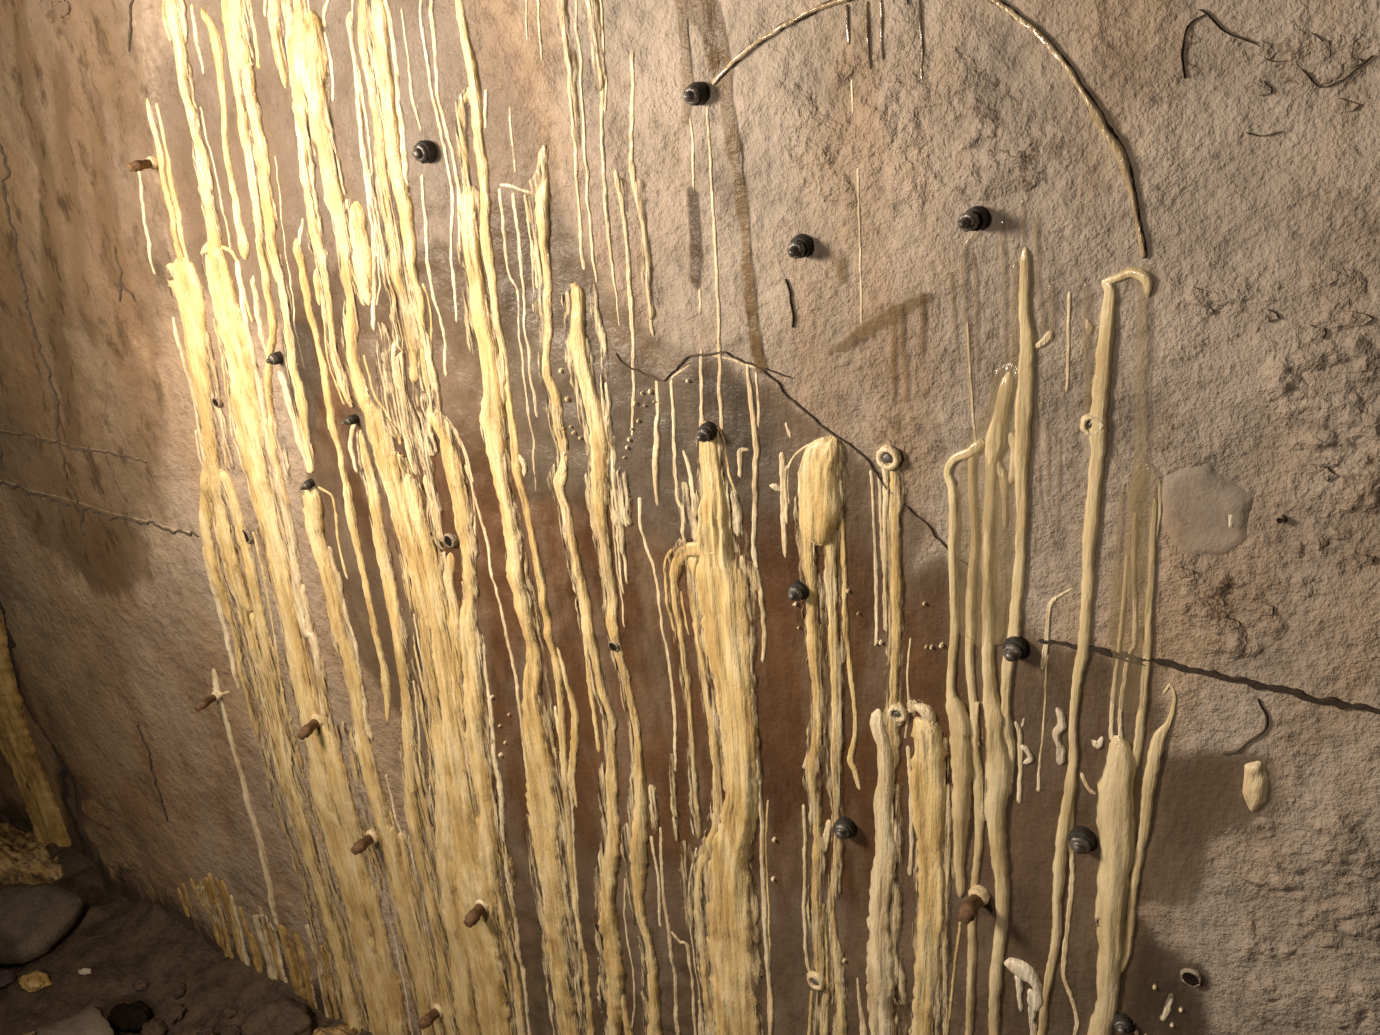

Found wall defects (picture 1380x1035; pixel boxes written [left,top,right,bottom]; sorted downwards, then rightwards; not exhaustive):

crack [126,0,134,52]
damp [137,171,156,275]
damp [201,7,250,260]
damp [629,50,656,336]
crack [711,0,853,85]
damp [845,0,884,69]
crack [987,0,1147,259]
crack [0,143,199,537]
crack [615,351,969,567]
crack [1038,639,1380,755]
damp [177,668,318,1009]
damp [648,784,659,833]